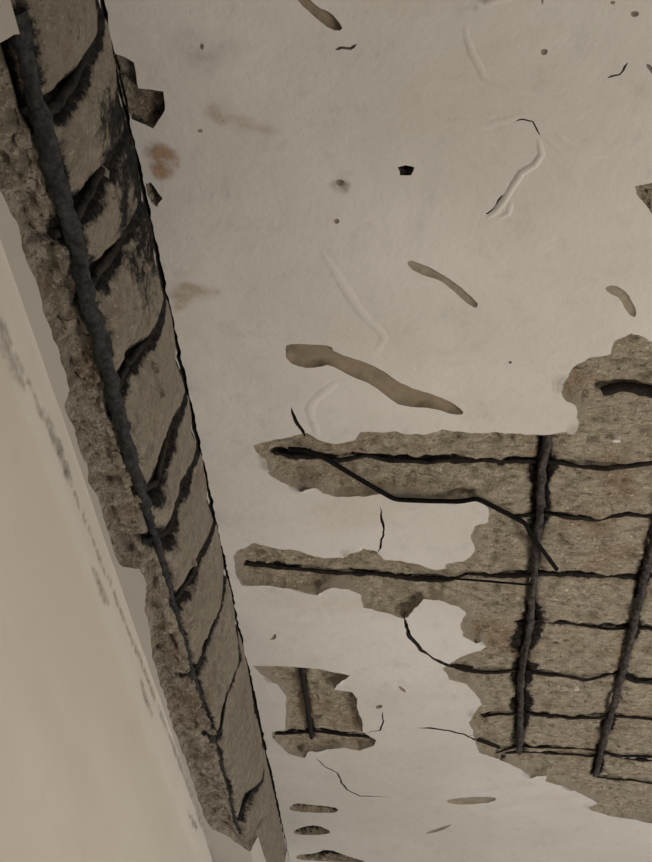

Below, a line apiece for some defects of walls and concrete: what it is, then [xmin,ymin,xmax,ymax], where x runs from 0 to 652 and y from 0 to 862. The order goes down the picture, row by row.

rust [151,146,173,179]
spalling [0,0,376,862]
crack [377,508,385,552]
spalling [233,334,652,824]
crack [316,758,379,797]